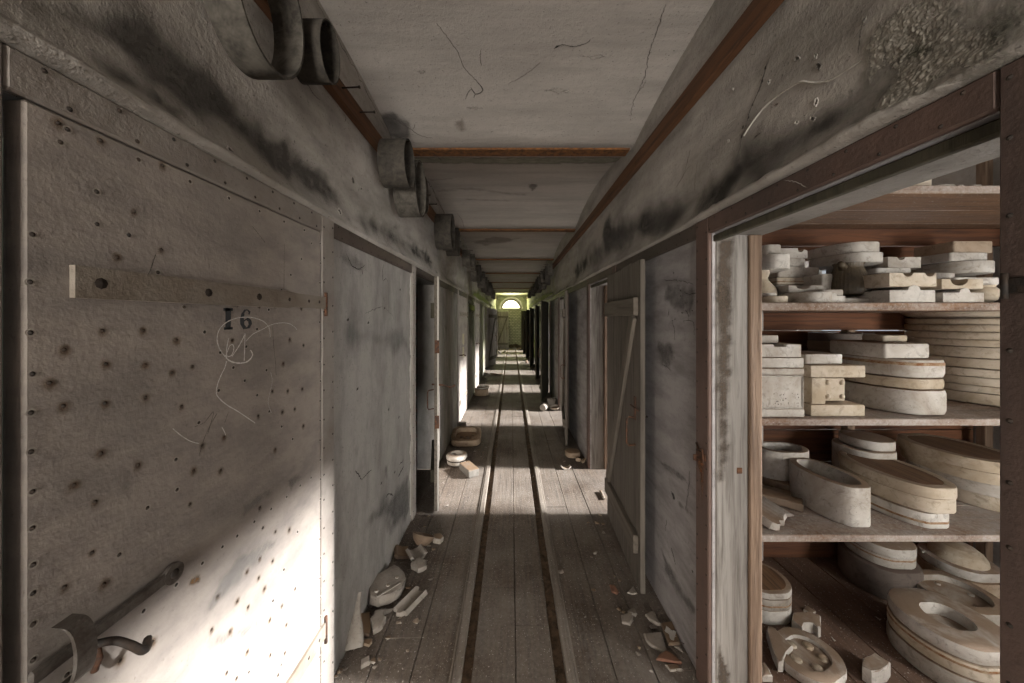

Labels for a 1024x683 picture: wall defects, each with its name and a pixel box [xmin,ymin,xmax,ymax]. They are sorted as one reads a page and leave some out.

crack [441,29,483,96]
crack [630,13,663,117]
spalling [866,0,1005,112]